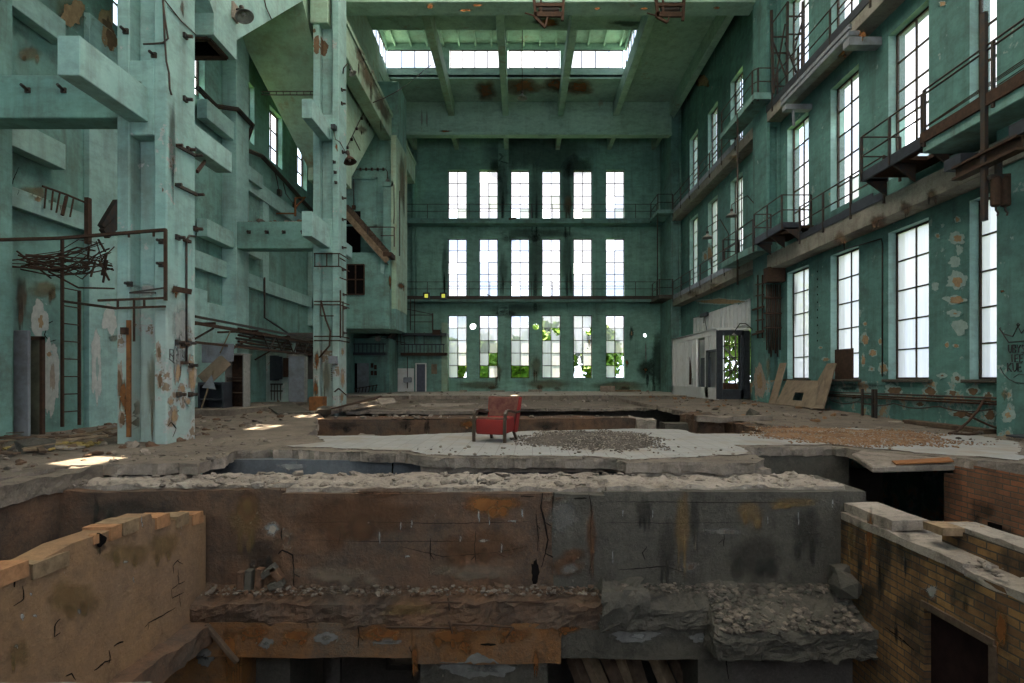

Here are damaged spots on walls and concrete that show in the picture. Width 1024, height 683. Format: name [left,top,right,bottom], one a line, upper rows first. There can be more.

peeling [59,0,117,52]
corrosion [510,77,591,94]
peeling [932,216,968,349]
peeling [30,299,60,422]
peeling [154,341,197,425]
crack [310,493,553,567]
crack [145,560,185,628]